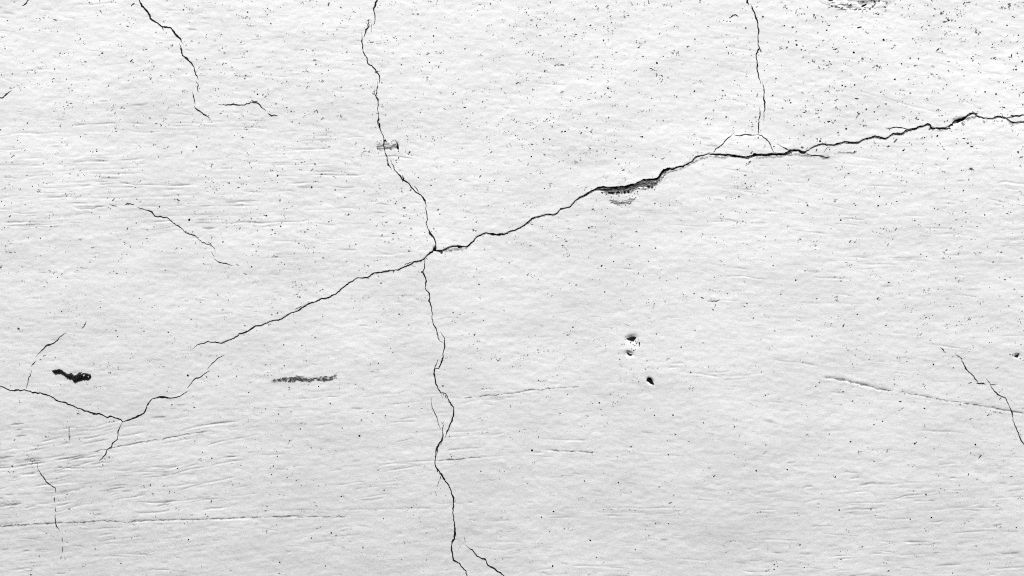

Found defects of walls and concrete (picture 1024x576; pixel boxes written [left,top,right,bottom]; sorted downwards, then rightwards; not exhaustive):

crack [670,0,1024,172]
crack [1,0,654,576]
crack [940,347,1024,444]